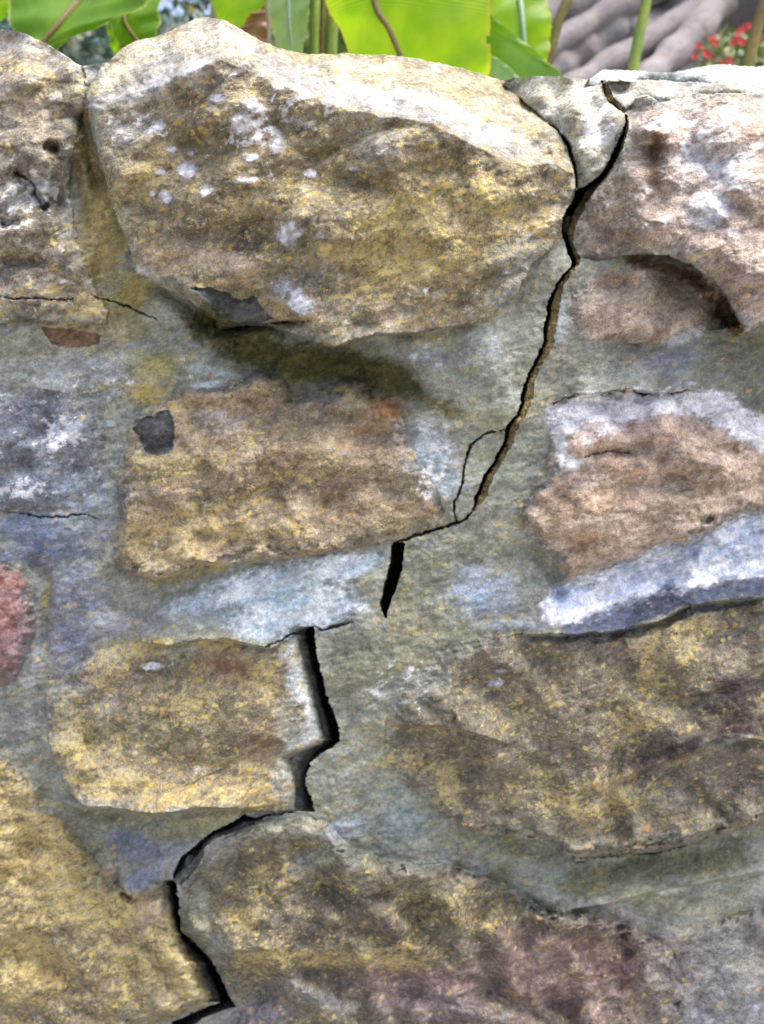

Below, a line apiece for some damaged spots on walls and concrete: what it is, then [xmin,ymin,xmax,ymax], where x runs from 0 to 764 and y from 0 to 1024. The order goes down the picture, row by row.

crack [379,80,628,618]
crack [164,624,344,1024]